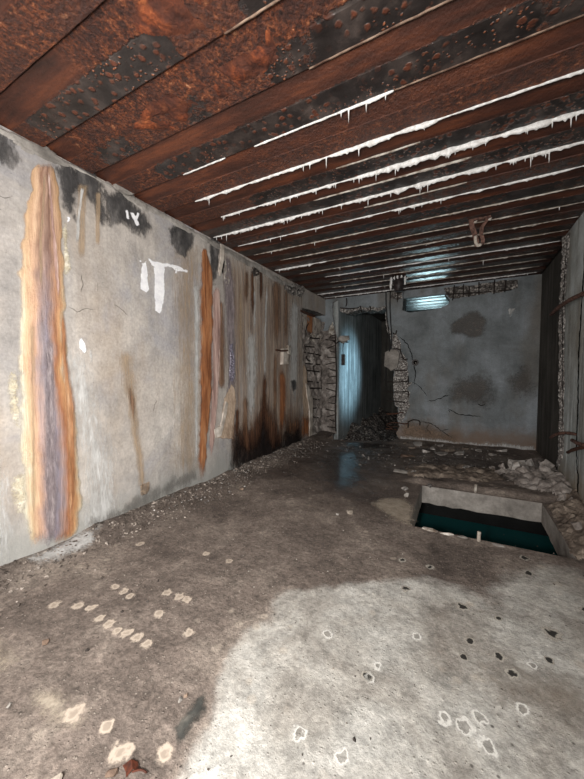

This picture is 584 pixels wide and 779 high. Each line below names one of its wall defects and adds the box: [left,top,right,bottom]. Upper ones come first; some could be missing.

corrosion [133,0,206,36]
corrosion [9,165,82,540]
leakage [57,163,150,252]
leakage [170,226,193,257]
corrosion [194,249,221,471]
leakage [210,238,236,392]
leakage [232,291,303,469]
spalling [302,317,325,440]
spalling [385,312,421,433]
crack [398,336,485,438]
spalling [444,279,518,301]
spalling [419,503,548,536]